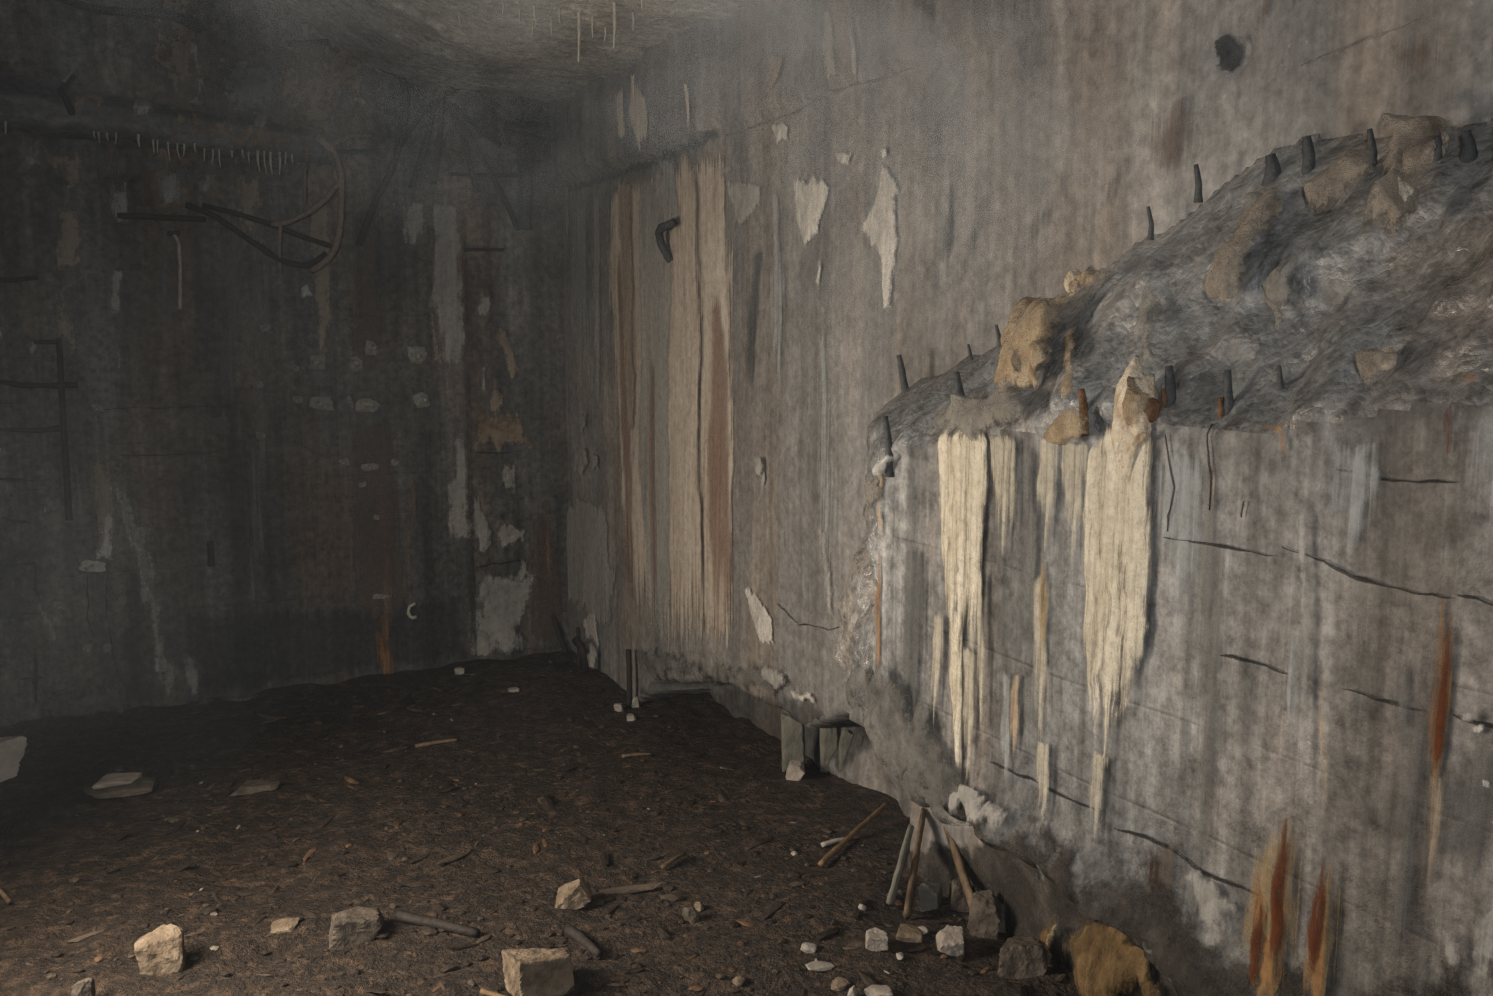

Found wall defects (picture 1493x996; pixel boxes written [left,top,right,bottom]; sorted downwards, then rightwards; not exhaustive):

peeling [794,175,829,245]
peeling [862,148,898,308]
water stain [563,75,784,645]
peeling [448,367,533,656]
water stain [990,435,1087,641]
crack [1163,424,1493,606]
water stain [903,551,984,770]
crack [990,761,1255,895]
crack [1220,654,1287,675]
corrosion [1249,819,1292,996]
corrosion [1305,861,1332,996]
corrosion [1429,619,1452,862]